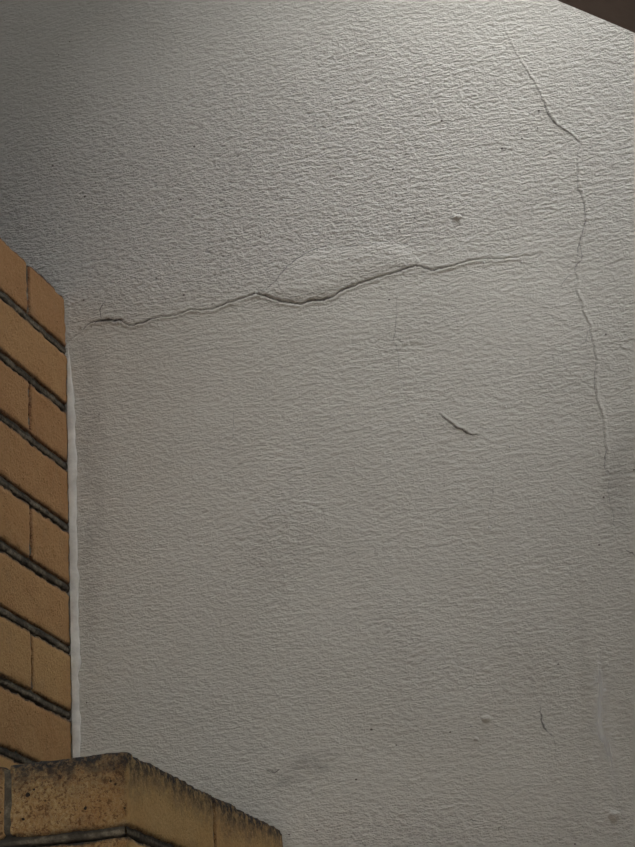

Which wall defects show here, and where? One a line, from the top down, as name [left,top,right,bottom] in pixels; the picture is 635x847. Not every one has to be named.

crack [65,241,542,346]
crack [439,411,480,436]